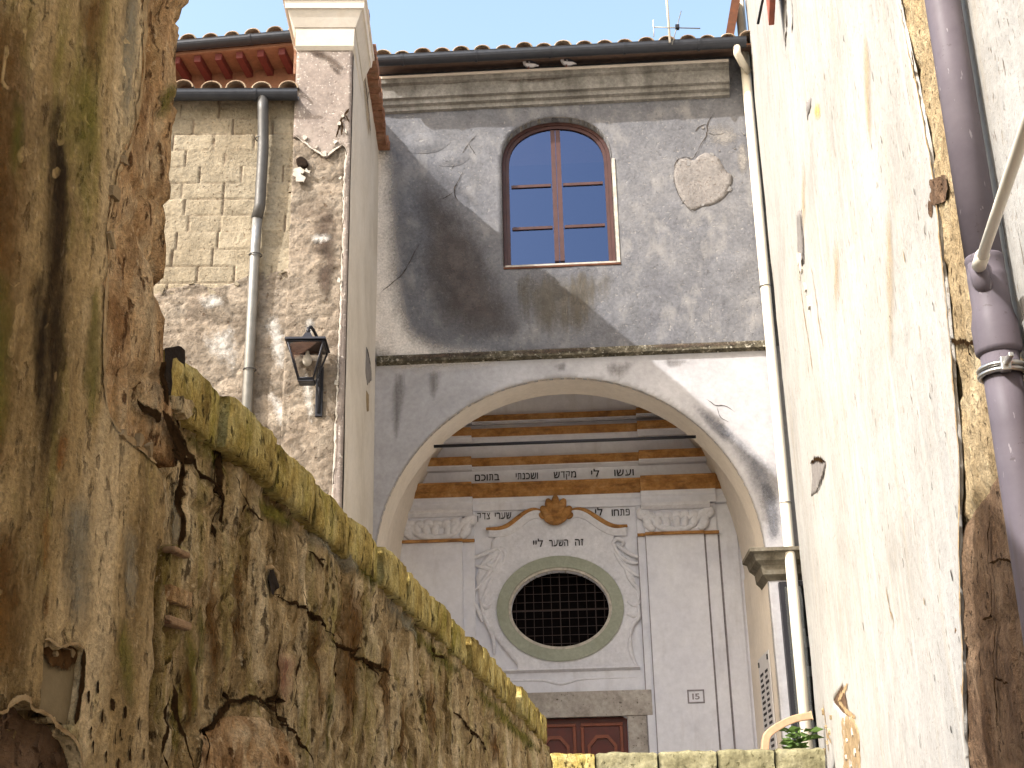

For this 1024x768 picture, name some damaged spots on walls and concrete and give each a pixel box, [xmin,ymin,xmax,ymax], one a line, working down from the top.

flaking render [674,127,747,212]
damp [428,200,508,330]
damp [523,276,594,327]
crack [137,362,263,548]
damp [705,414,730,437]
damp [739,445,777,533]
flaking render [810,455,826,496]
crack [274,592,392,677]
crack [162,643,314,768]